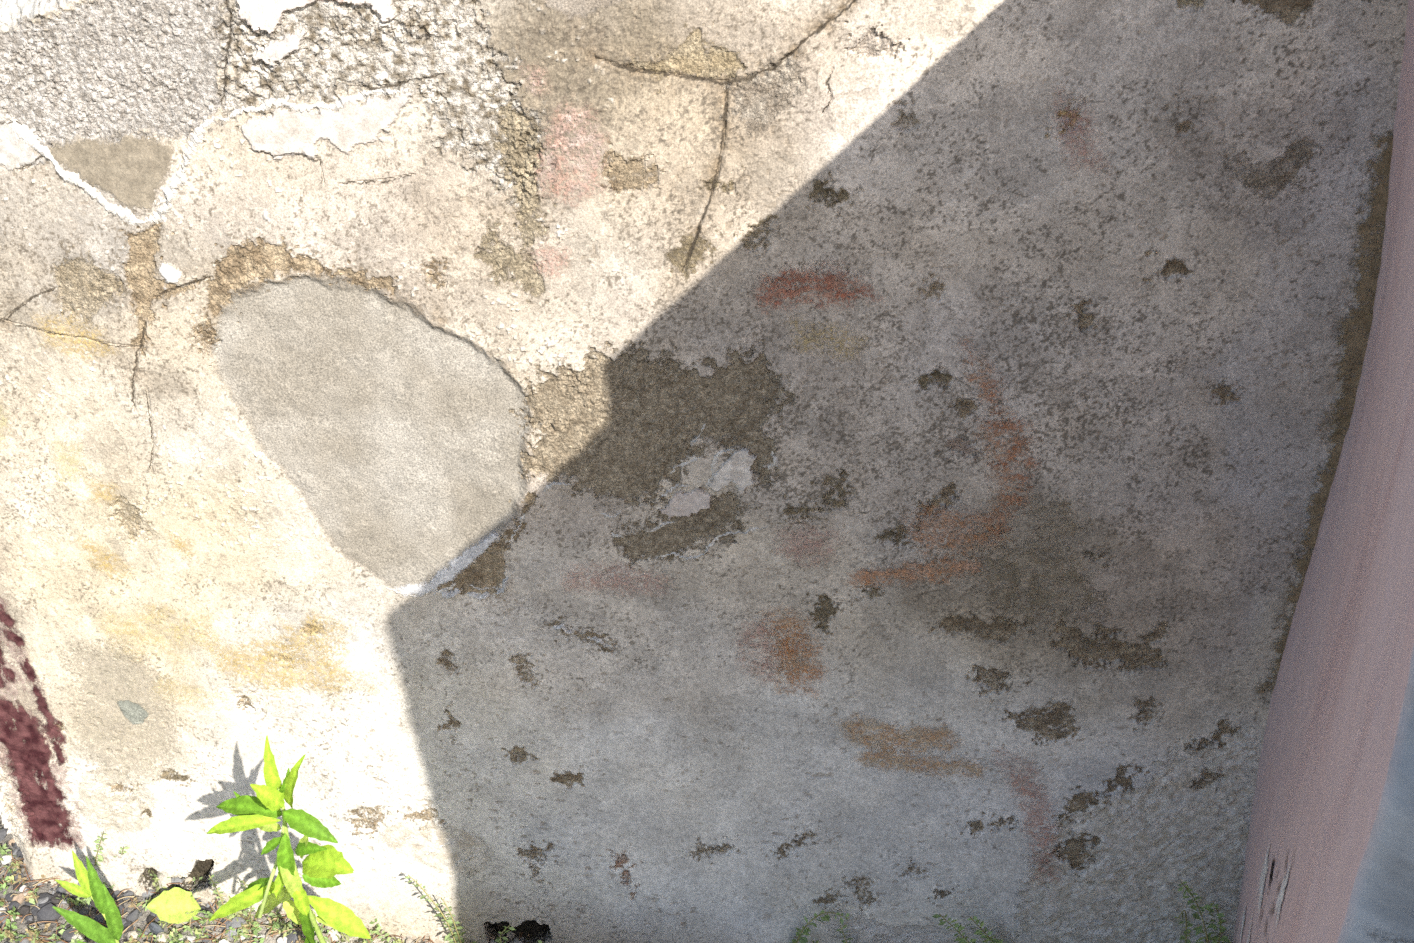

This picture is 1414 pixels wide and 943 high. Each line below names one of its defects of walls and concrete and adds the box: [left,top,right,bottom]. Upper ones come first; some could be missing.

crack [220,0,232,104]
peeling [0,0,559,303]
crack [595,0,856,272]
crack [0,277,207,469]
spalling [386,339,854,602]